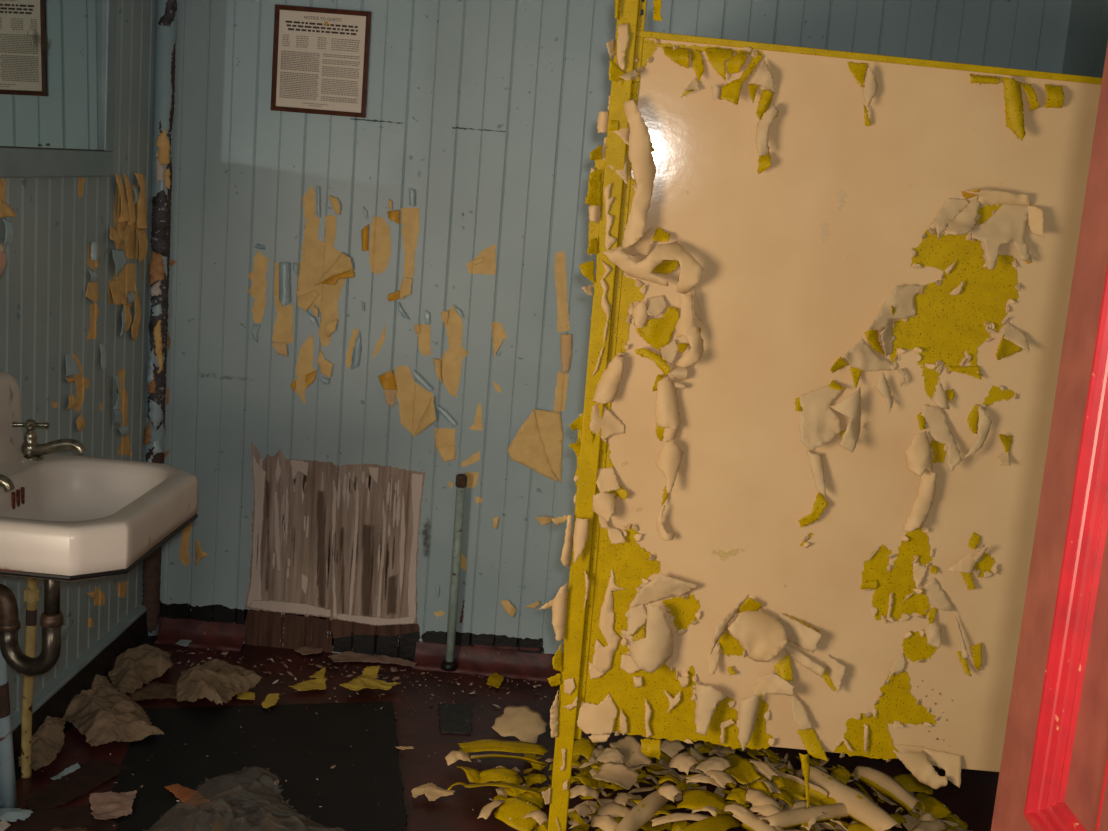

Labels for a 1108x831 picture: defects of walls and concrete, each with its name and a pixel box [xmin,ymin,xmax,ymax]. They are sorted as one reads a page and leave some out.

peeling [158,0,178,26]
peeling [970,74,1065,141]
peeling [52,353,90,439]
peeling [85,39,177,463]
peeling [247,185,386,404]
peeling [361,189,483,503]
peeling [466,244,496,275]
peeling [491,321,508,356]
peeling [494,0,1045,831]
peeling [244,443,426,653]